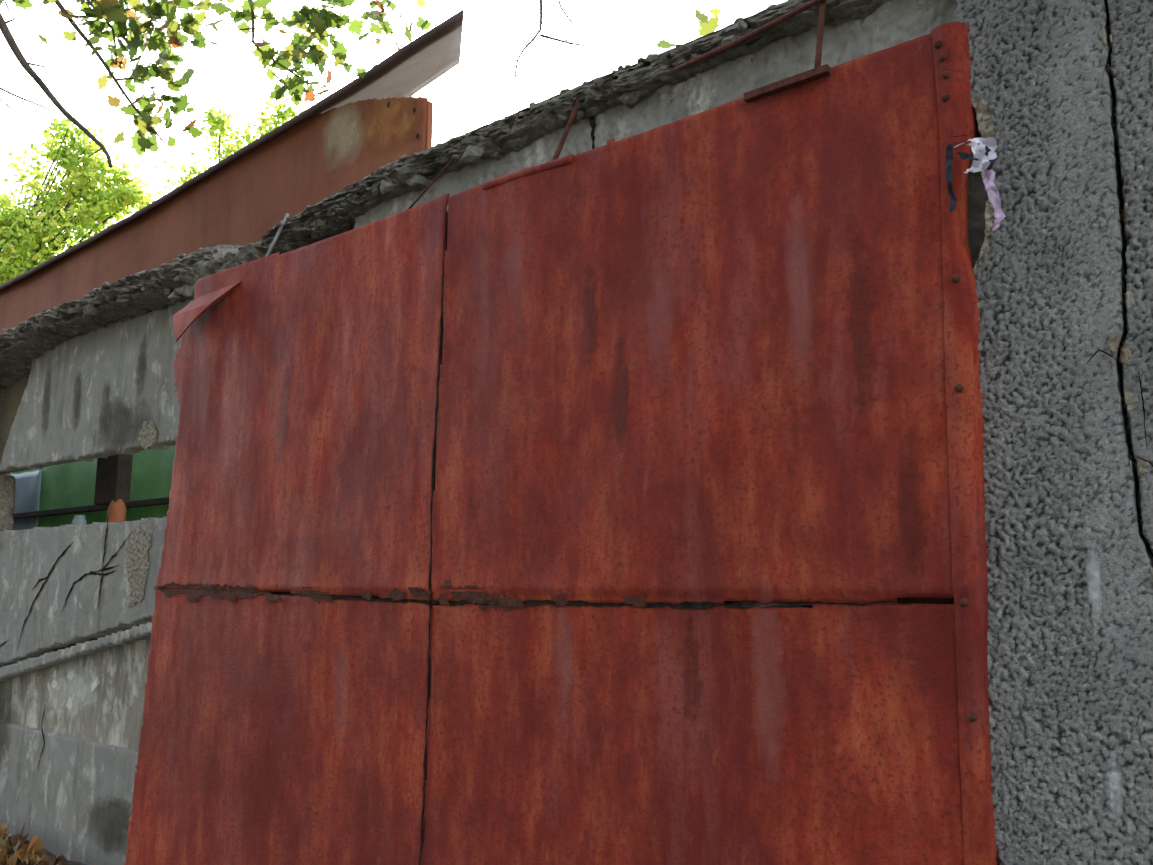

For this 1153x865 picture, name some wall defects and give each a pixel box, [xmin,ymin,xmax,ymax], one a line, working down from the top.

crack [1086,0,1153,584]
crack [0,515,130,650]
rust [154,581,281,604]
rust [295,587,333,604]
rust [388,580,525,611]